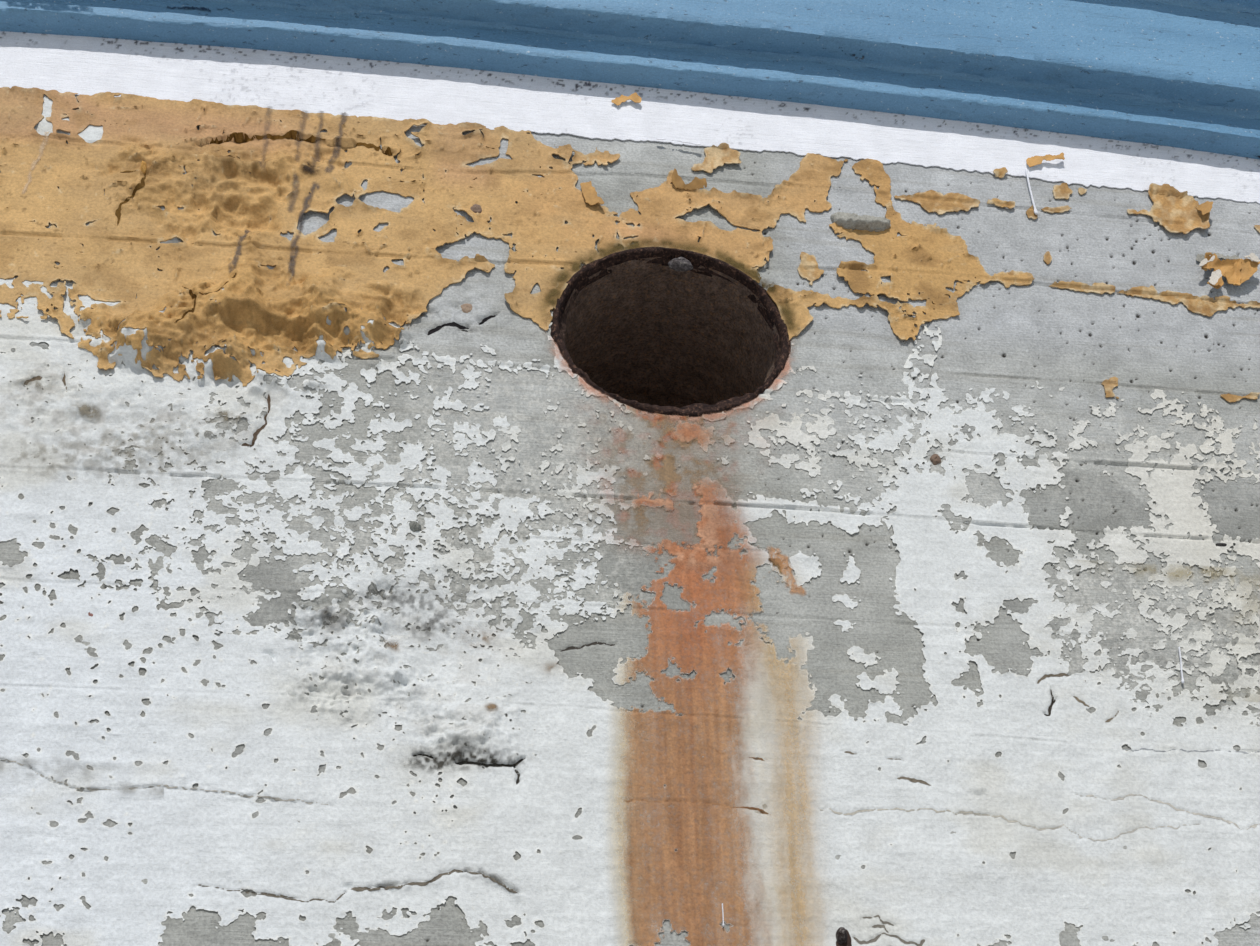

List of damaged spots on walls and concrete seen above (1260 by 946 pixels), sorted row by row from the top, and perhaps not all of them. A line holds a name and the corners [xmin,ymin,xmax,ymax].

crack [210,130,326,144]
crack [356,142,392,156]
peeling [0,86,1260,812]
corrosion [770,548,805,593]
corrosion [627,398,761,946]
water stain [415,747,511,769]
crack [1,759,328,805]
corrosion [769,645,807,946]
crack [199,869,517,902]
peeling [2,895,38,932]
peeling [159,894,289,946]
peeling [323,897,494,946]